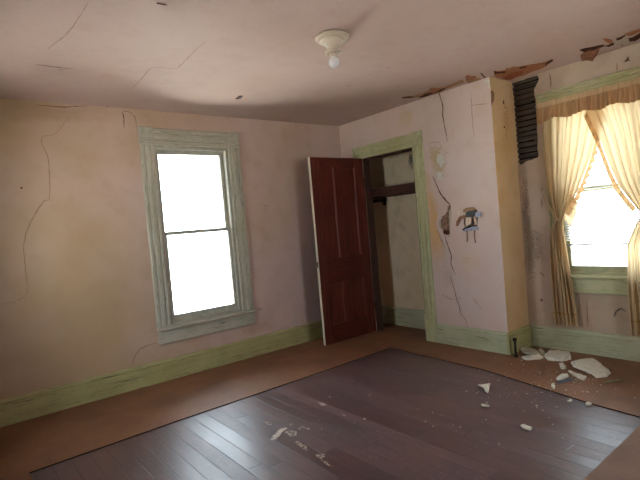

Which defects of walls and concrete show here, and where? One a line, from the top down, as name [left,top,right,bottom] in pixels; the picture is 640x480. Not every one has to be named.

flaking render [465,78,494,107]
crack [5,105,82,304]
flaking render [439,205,451,235]
damp [495,86,544,298]
crack [442,236,483,327]